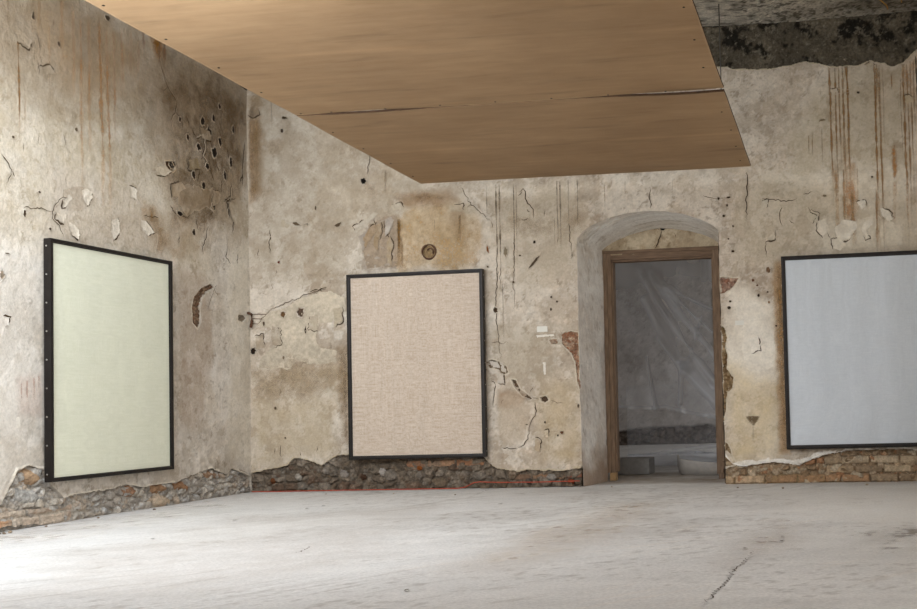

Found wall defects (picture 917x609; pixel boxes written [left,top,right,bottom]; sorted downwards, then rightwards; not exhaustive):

spalling [703,11,917,73]
corrosion [828,66,855,221]
corrosion [873,65,915,237]
peeling [806,199,904,251]
crack [462,186,545,359]
spalling [547,329,581,391]
crack [491,381,499,406]
crack [504,386,561,449]
spalling [619,324,917,484]
spalling [0,451,583,532]
crack [704,551,756,607]